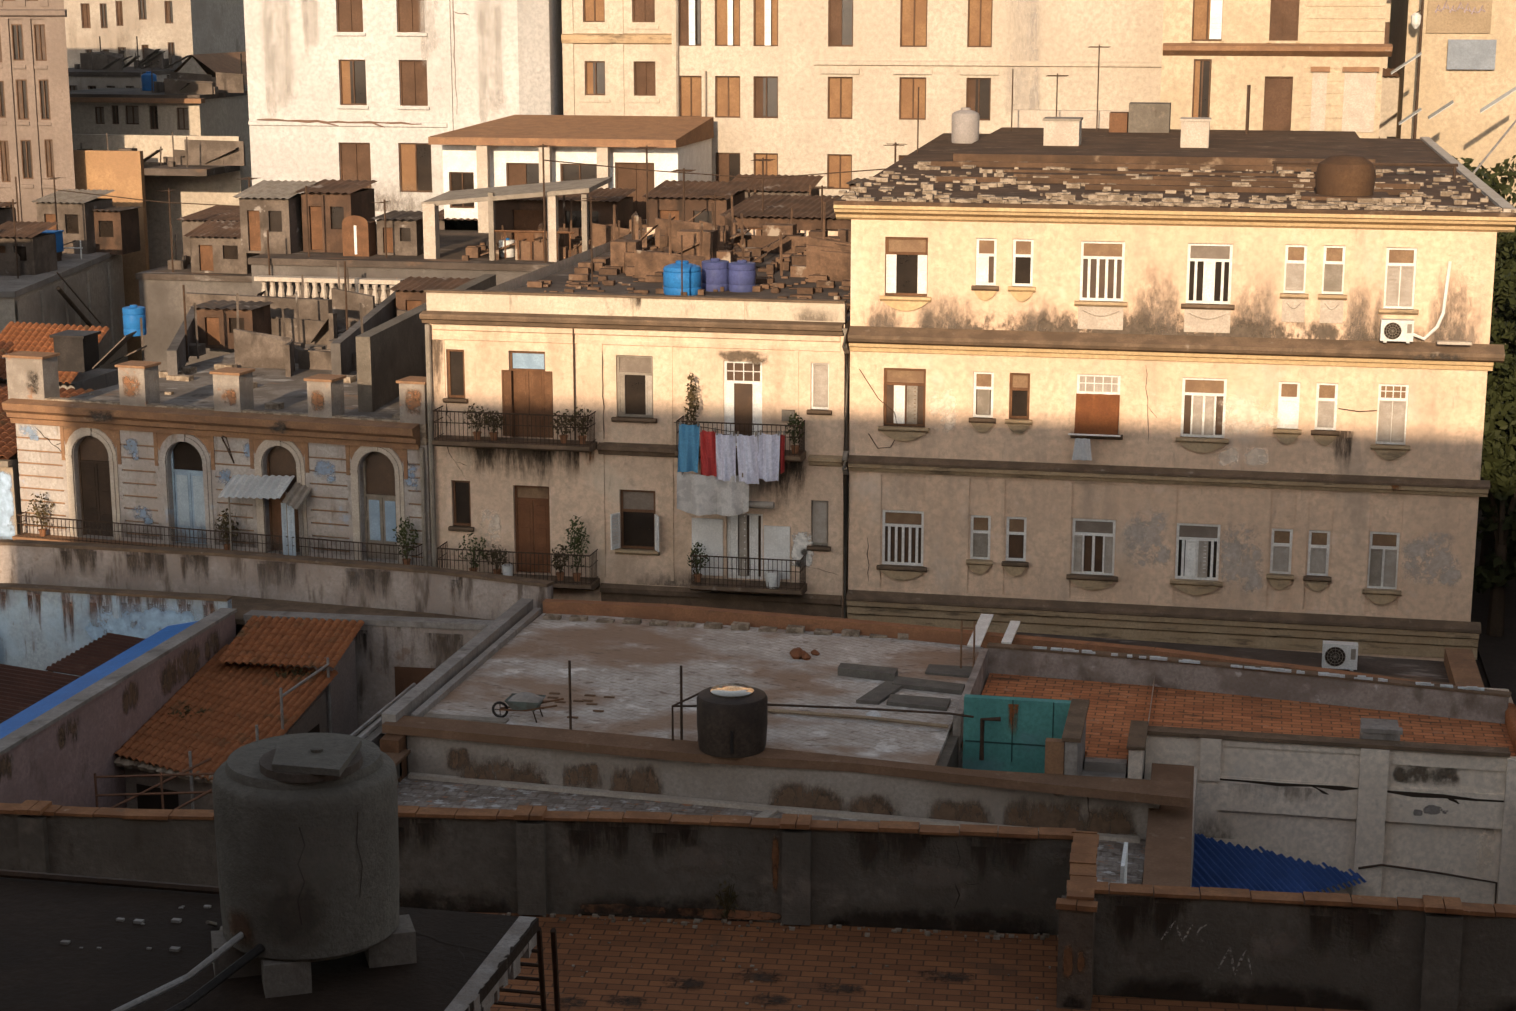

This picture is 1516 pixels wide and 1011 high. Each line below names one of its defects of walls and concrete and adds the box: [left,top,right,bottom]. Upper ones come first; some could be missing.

water stain [923,302,1380,341]
water stain [1413,308,1475,360]
water stain [448,748,661,794]
water stain [771,784,893,815]
crack [1220,778,1504,804]
water stain [565,821,628,856]
water stain [648,823,699,850]
water stain [580,900,750,922]